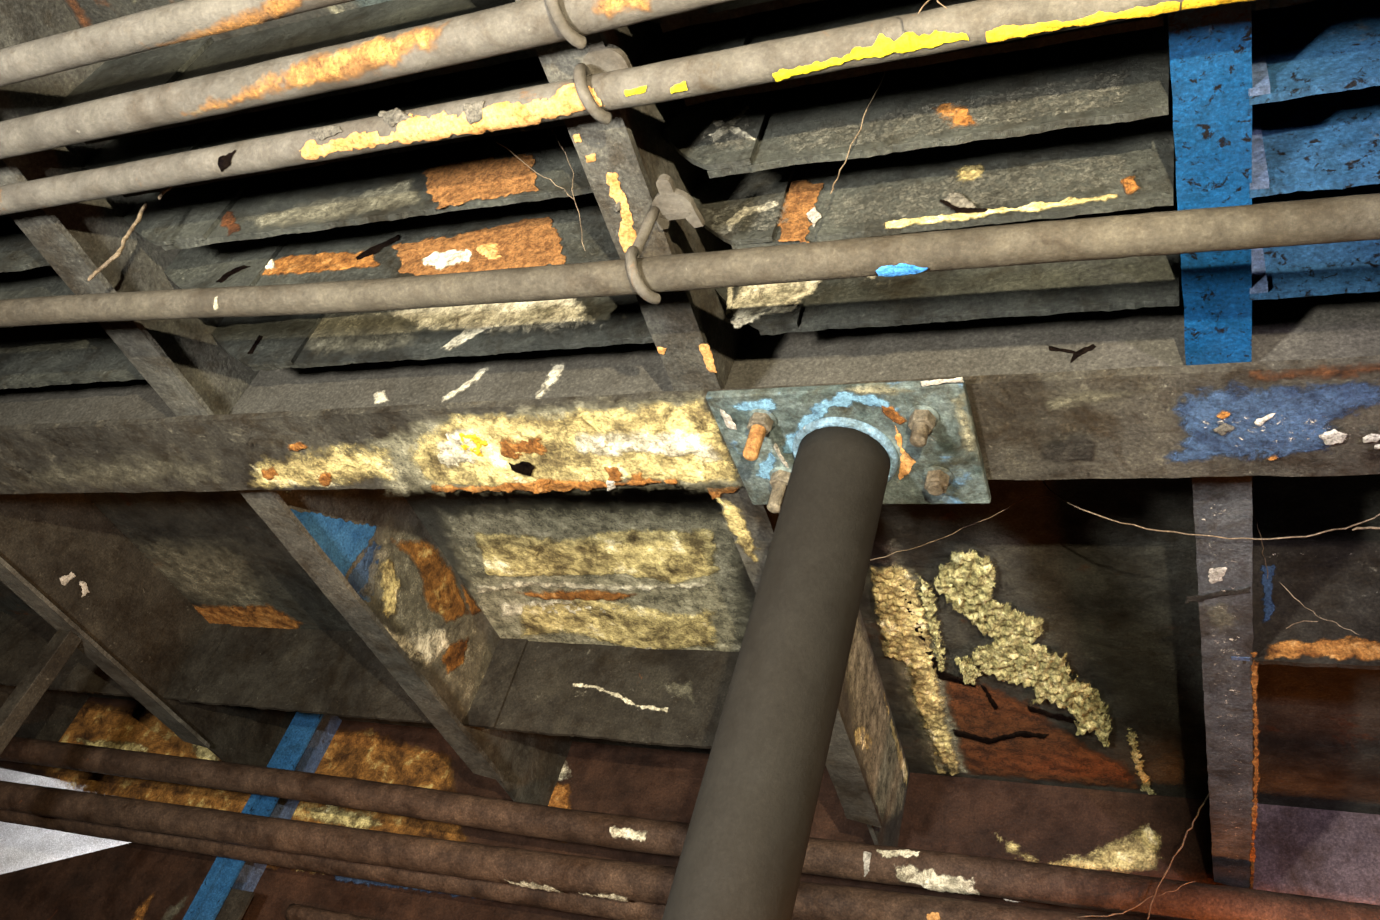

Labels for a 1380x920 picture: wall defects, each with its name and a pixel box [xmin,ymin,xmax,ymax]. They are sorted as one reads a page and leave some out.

corrosion [207,27,435,108]
corrosion [262,217,566,276]
leakage [254,364,738,490]
corrosion [881,406,916,483]
peeling [1163,381,1380,462]
leakage [447,503,743,652]
leakage [854,726,872,750]
leakage [884,696,908,787]
corrosion [1249,636,1380,889]